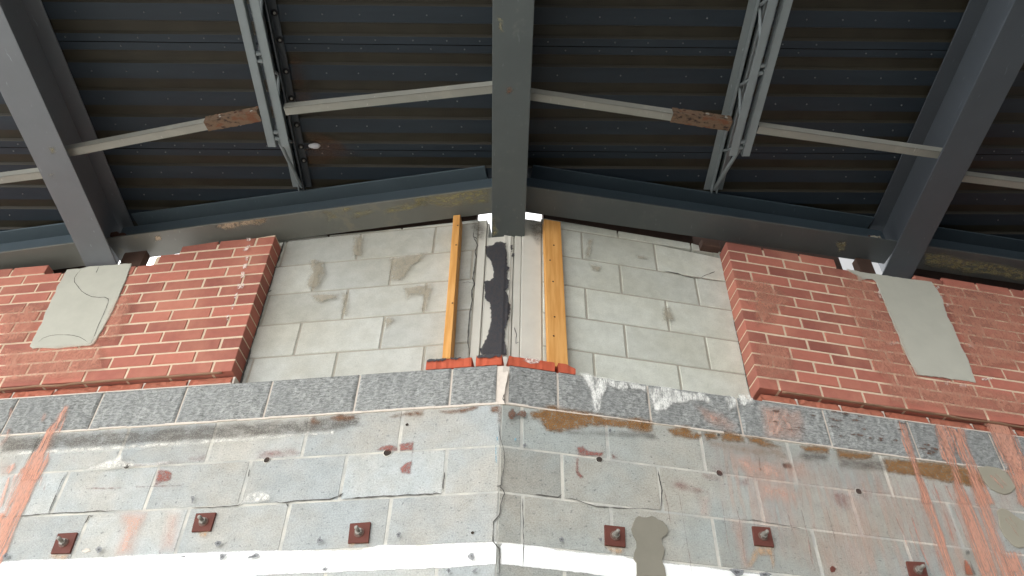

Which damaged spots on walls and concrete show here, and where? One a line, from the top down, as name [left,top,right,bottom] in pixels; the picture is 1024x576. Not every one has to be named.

leakage [581,374,709,410]
leakage [727,395,753,408]
rust [531,406,651,432]
rust [804,446,871,459]
rust [884,459,984,486]
crack [492,432,663,573]